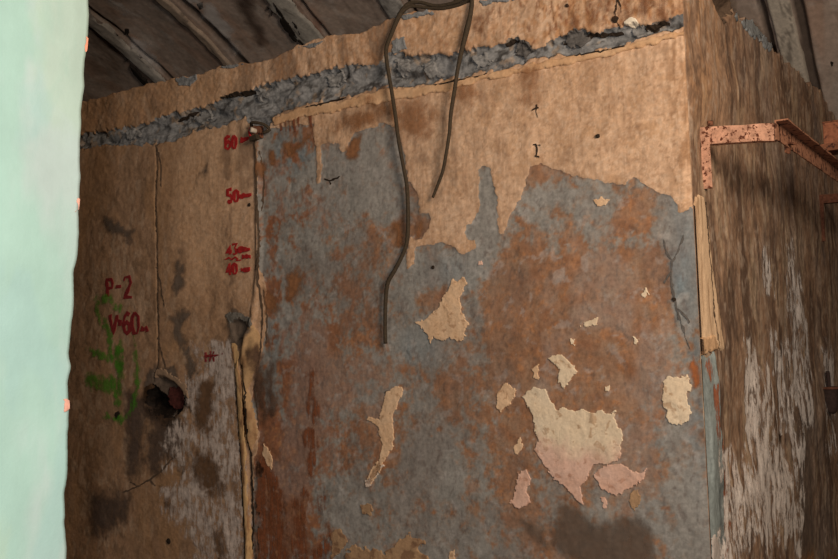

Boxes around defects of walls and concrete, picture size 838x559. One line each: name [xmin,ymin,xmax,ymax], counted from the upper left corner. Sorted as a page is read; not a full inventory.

crack [154,145,166,381]
damp [172,260,184,294]
crack [254,141,268,353]
peeling [80,14,726,559]
damp [126,309,277,559]
rust [303,371,320,479]
damp [91,491,128,536]
rust [255,457,330,559]
damp [554,507,652,559]